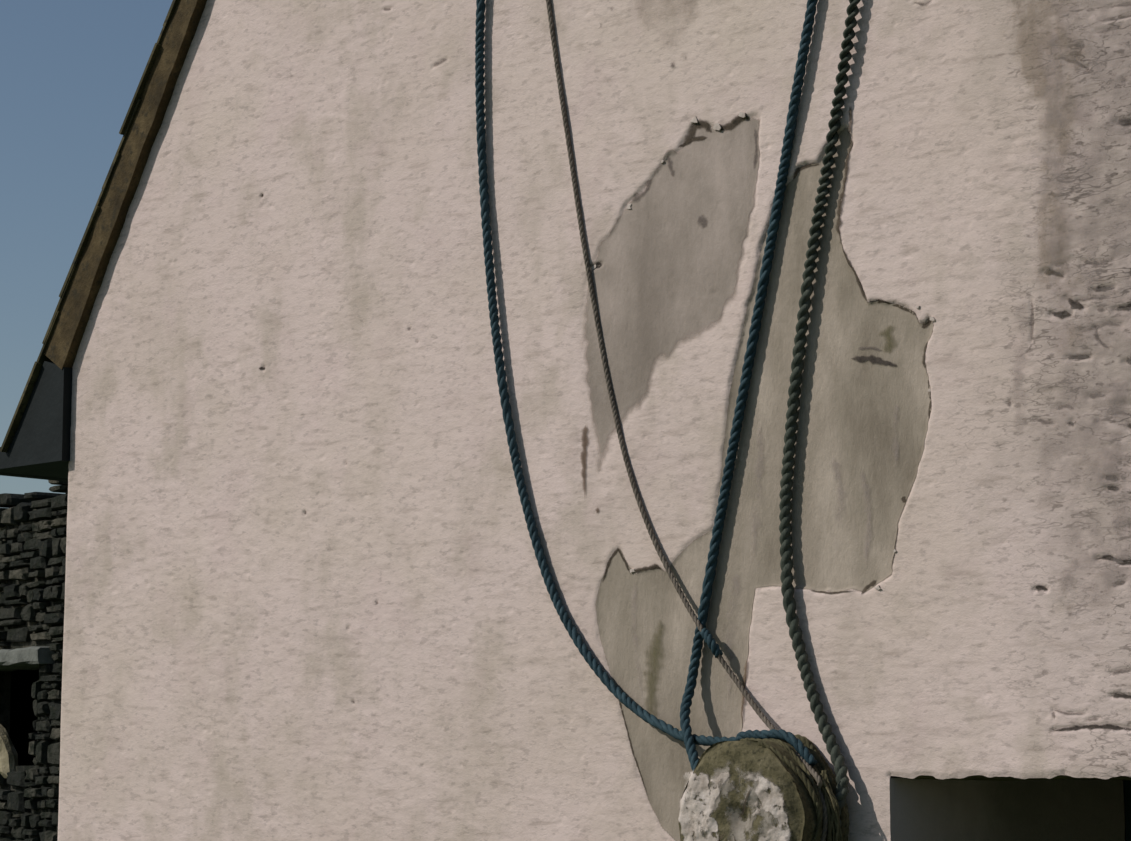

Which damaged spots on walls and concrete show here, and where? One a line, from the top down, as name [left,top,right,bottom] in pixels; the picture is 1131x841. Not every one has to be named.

peeling [584,112,935,841]